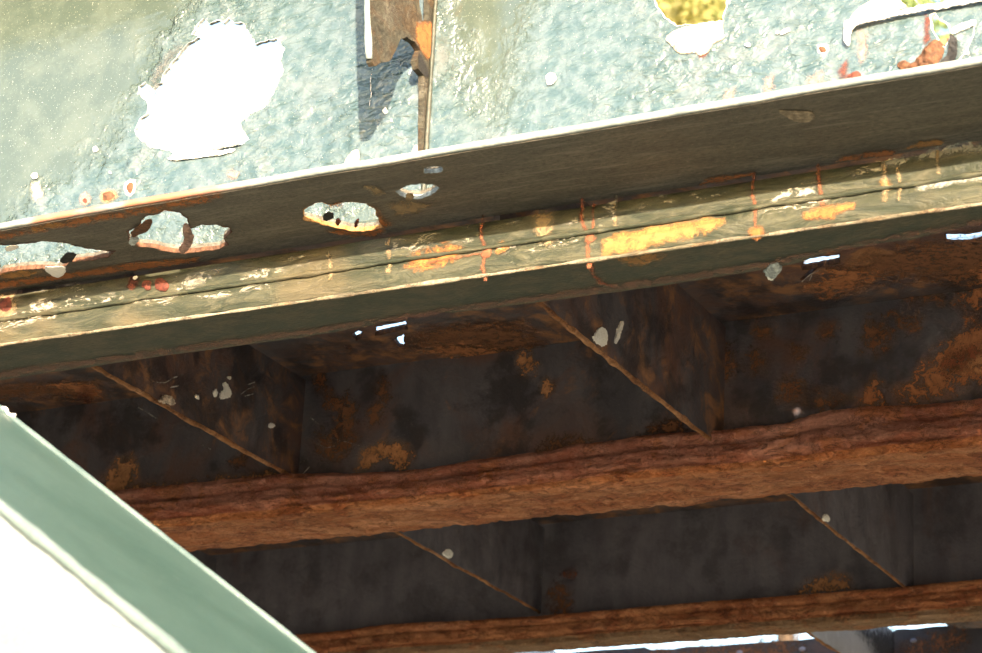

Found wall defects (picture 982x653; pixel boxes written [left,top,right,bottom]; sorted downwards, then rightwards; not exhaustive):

corrosion [416,22,432,77]
spalling [666,20,725,55]
spalling [850,0,907,19]
peeling [950,20,976,34]
peeling [168,149,236,160]
corrosion [0,180,220,239]
corrosion [580,195,722,287]
corrosion [0,257,200,289]
spalling [127,272,210,303]
corrosion [803,226,982,407]
corrosion [0,366,288,491]
corrosion [635,632,840,653]